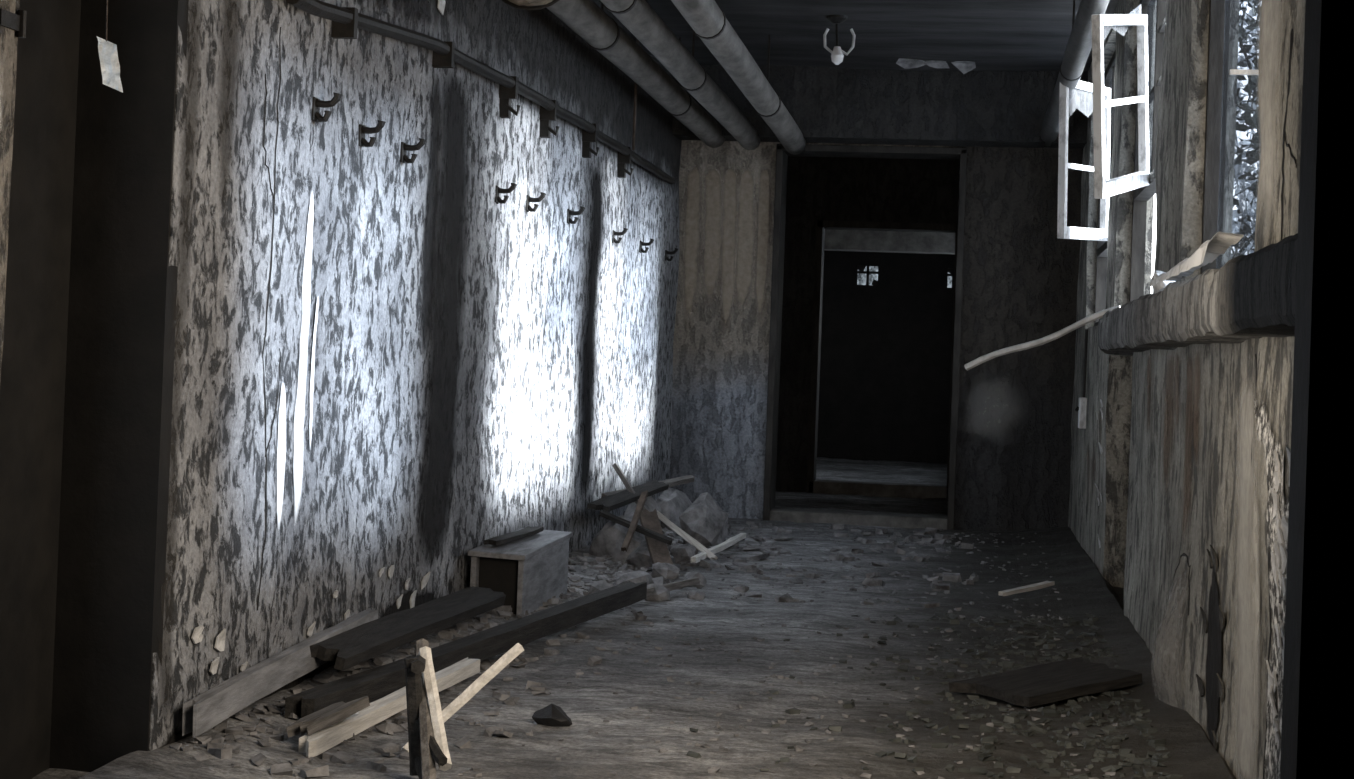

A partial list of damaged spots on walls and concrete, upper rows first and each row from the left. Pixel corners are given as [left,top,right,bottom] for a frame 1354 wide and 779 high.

spalling [1254,401,1291,779]